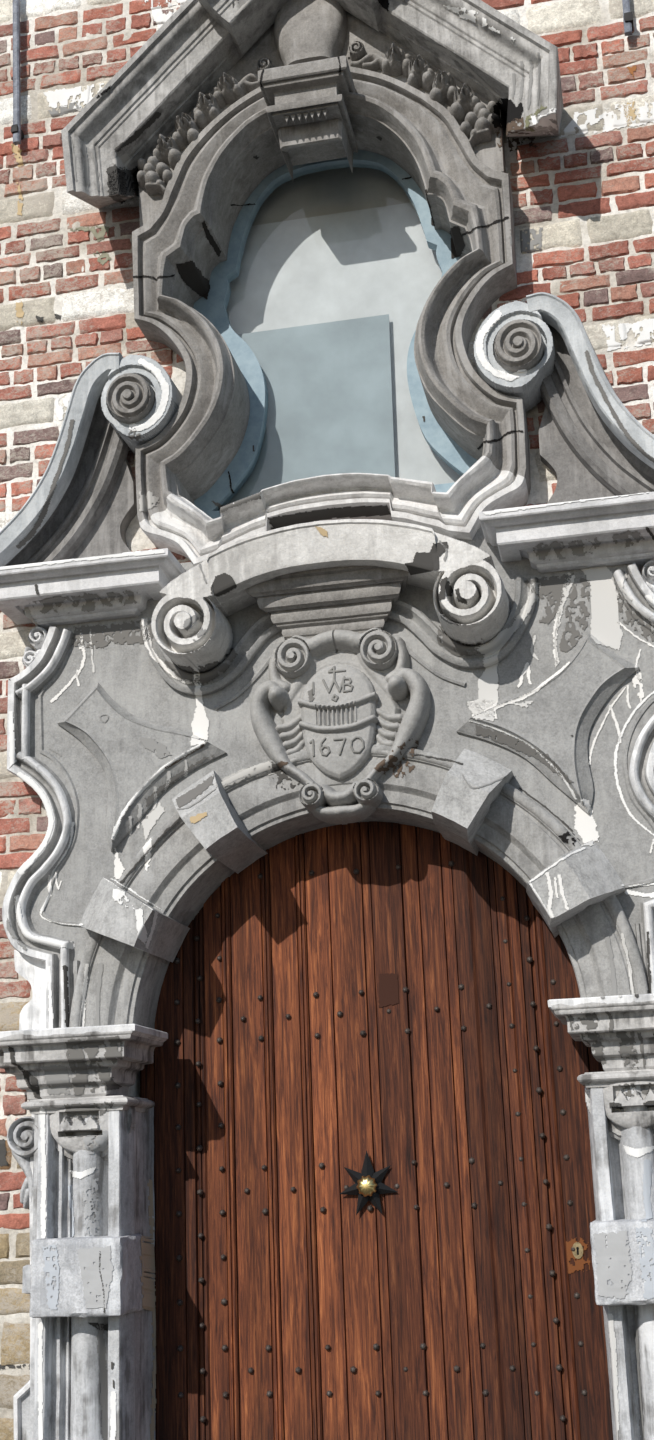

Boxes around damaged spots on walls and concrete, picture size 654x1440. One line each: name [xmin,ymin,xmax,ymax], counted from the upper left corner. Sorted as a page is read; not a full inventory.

crack [461,216,509,237]
crack [133,273,175,281]
water stain [567,931,654,1110]